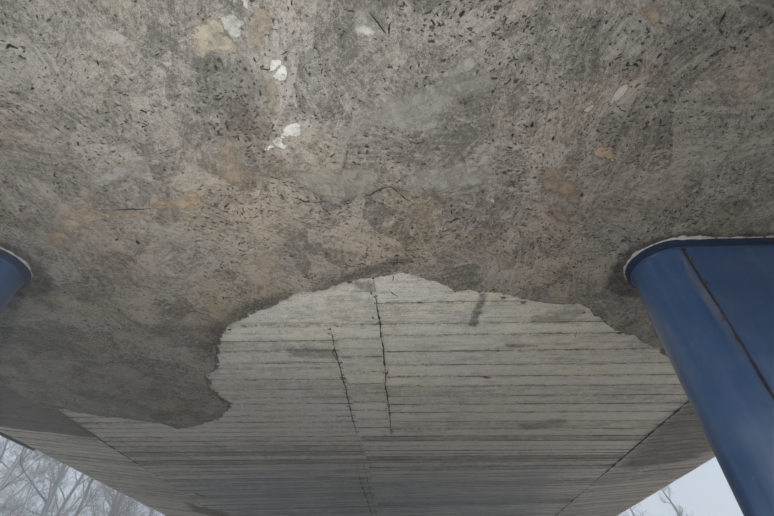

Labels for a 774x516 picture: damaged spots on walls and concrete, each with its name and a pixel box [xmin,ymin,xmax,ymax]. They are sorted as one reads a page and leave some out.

crack [327,262,404,441]
spalling [58,273,688,437]